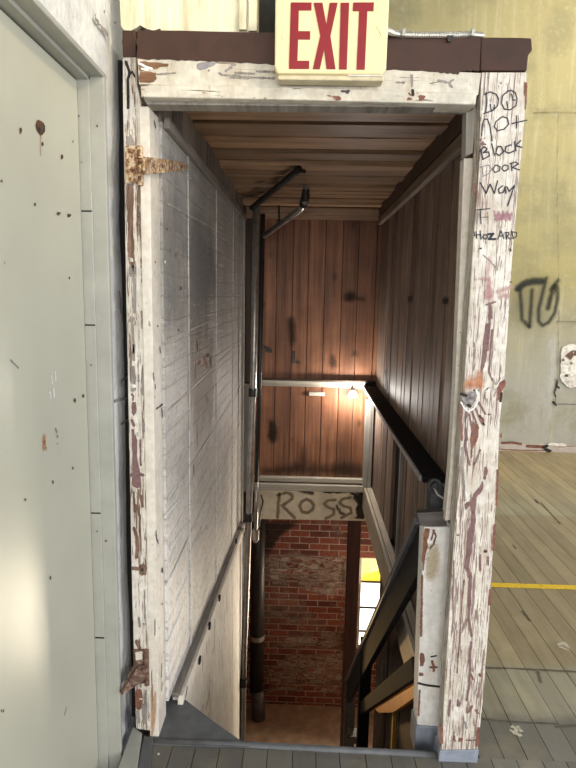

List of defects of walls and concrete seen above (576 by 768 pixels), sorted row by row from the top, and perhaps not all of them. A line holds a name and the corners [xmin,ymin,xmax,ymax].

peeling [138,61,168,83]
peeling [197,62,215,71]
corrosion [36,120,45,146]
peeling [481,301,506,402]
peeling [126,184,163,576]
peeling [420,528,437,637]
peeling [448,401,499,747]
peeling [419,652,438,676]
peeling [135,685,147,724]